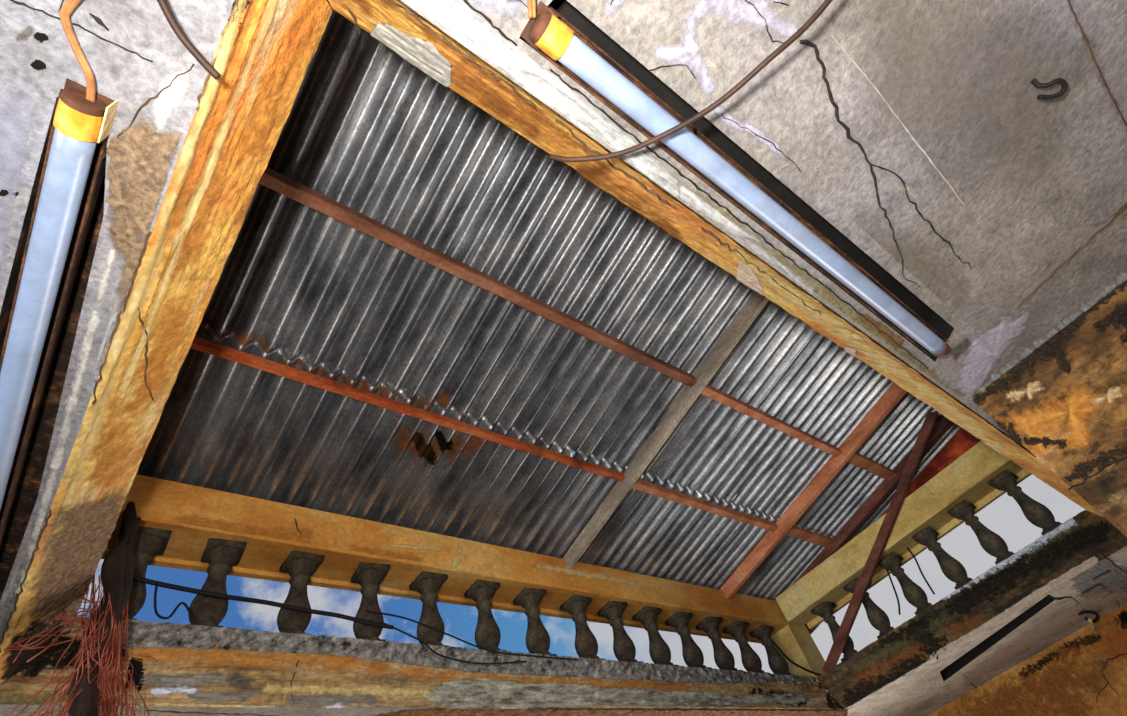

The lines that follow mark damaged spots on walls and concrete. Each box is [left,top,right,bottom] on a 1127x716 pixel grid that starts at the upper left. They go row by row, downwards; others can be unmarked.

crack [10,0,153,62]
peeling [348,9,452,87]
corrosion [86,306,188,483]
damp [0,0,276,628]
corrosion [163,177,216,277]
corrosion [282,359,450,409]
crack [549,69,928,369]
damp [402,0,1127,454]
crack [745,0,972,288]
peeling [950,313,1029,396]
spalling [122,619,848,716]
damp [818,518,1127,710]